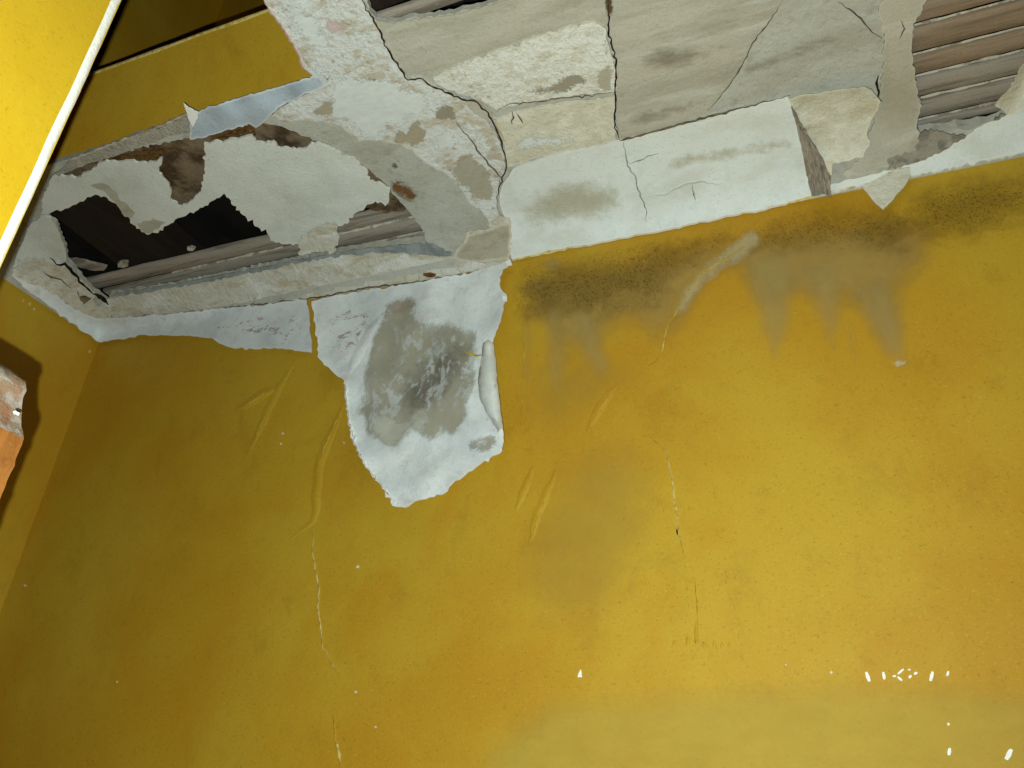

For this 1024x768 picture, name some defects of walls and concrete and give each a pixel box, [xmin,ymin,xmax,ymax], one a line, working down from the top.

crack [362,0,790,219]
flaking render [791,0,926,210]
peeling [10,0,785,508]
damp [361,300,475,445]
damp [538,260,707,337]
damp [743,235,915,310]